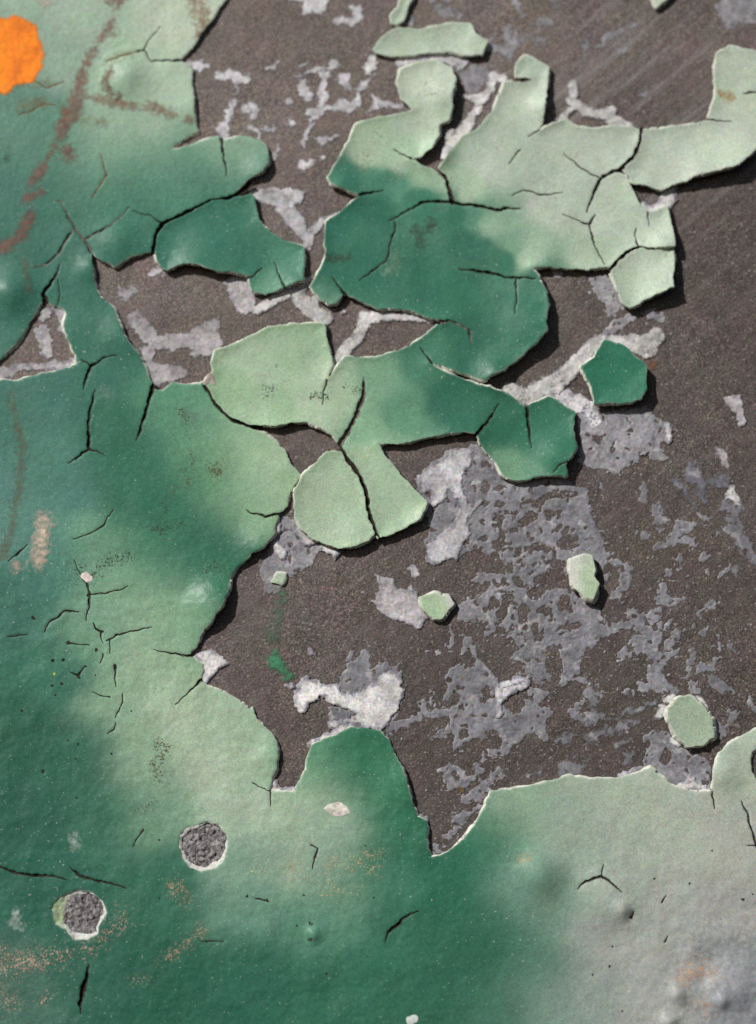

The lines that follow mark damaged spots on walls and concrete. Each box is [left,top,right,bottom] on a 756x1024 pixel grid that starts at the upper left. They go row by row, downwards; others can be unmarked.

corrosion [0,0,135,250]
crack [33,138,253,305]
crack [332,127,654,296]
crack [67,354,116,464]
crack [136,383,156,440]
crack [202,385,262,429]
crack [337,377,380,538]
peeling [92,0,756,855]
crack [7,509,202,734]
spalling [52,890,106,939]
spalling [179,821,227,871]
crack [577,864,634,917]